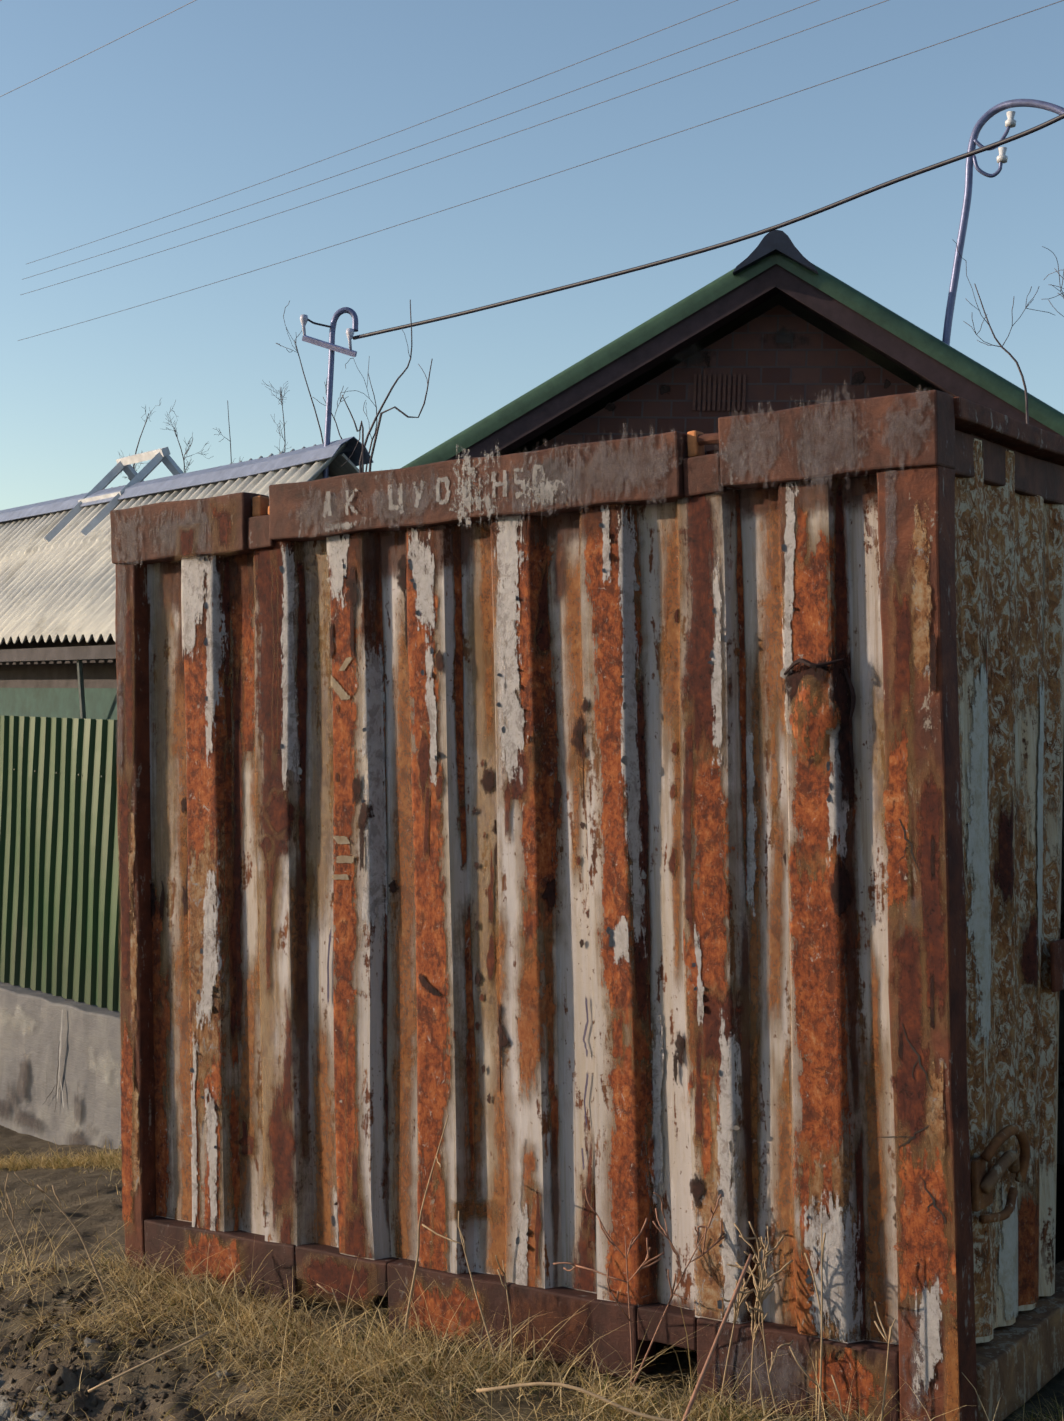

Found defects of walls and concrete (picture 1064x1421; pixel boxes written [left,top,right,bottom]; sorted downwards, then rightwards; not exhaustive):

corrosion [118,599,134,993]
corrosion [120,1021,134,1229]
peeling [109,500,229,777]
peeling [189,859,224,1231]
peeling [279,543,302,792]
peeling [290,424,677,965]
corrosion [151,474,960,1421]
peeling [707,557,722,771]
peeling [780,371,934,749]
peeling [967,663,991,1046]
corrosion [955,440,1064,1338]
peeling [902,1273,943,1421]